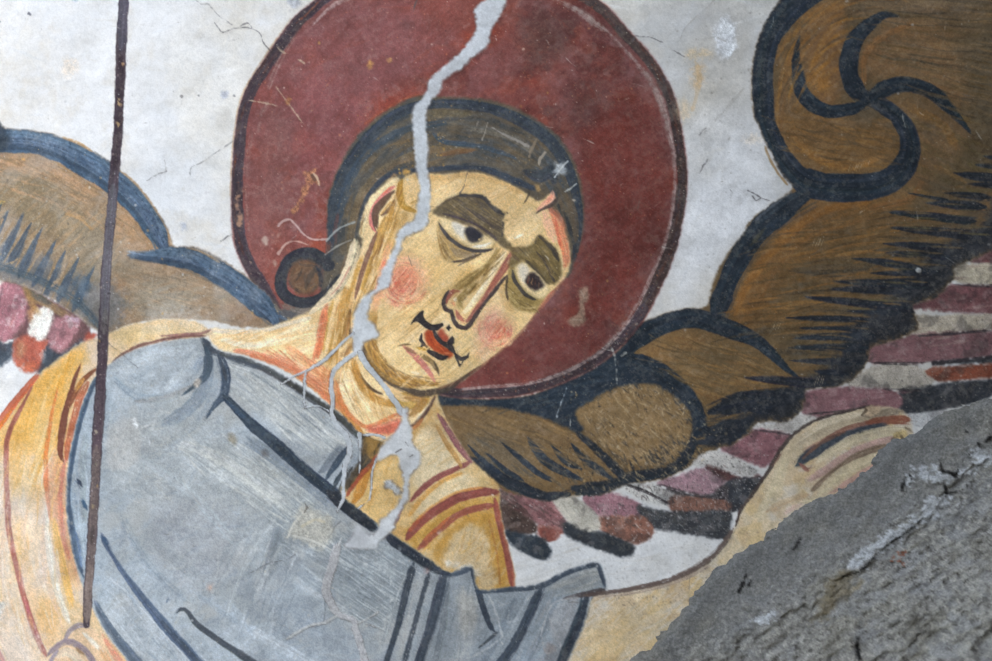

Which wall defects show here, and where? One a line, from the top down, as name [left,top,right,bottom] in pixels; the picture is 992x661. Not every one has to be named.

crack [280,0,509,661]
peeling [859,403,882,418]